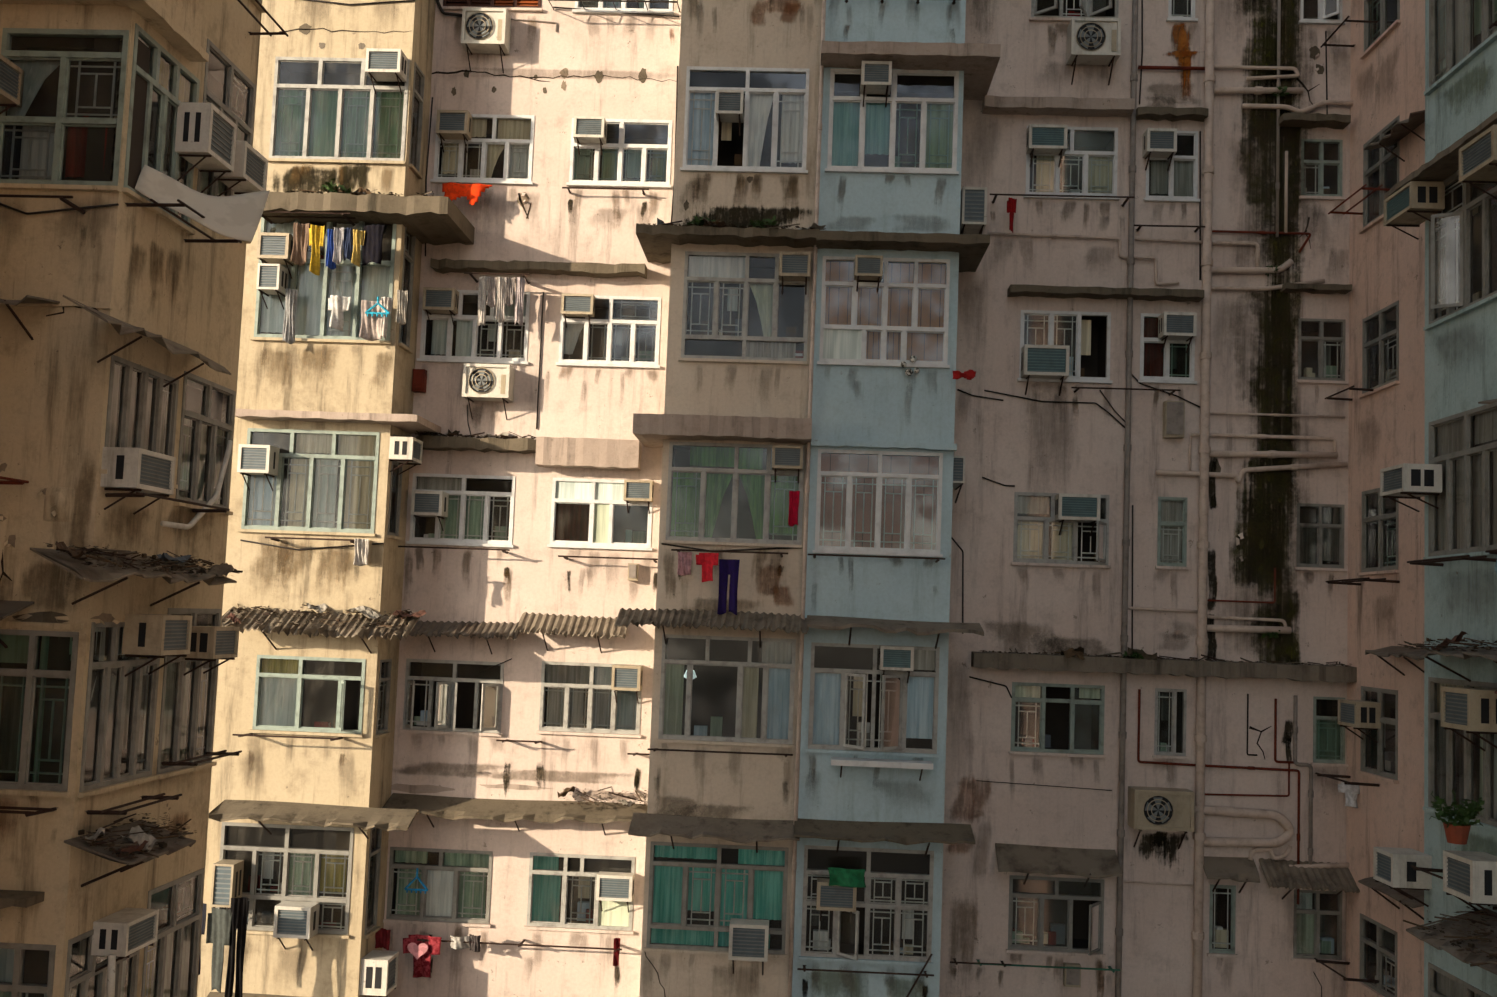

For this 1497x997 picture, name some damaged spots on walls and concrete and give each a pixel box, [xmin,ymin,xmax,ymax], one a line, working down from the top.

rust [1168,23,1197,89]
damp [683,205,812,228]
damp [1207,0,1306,664]